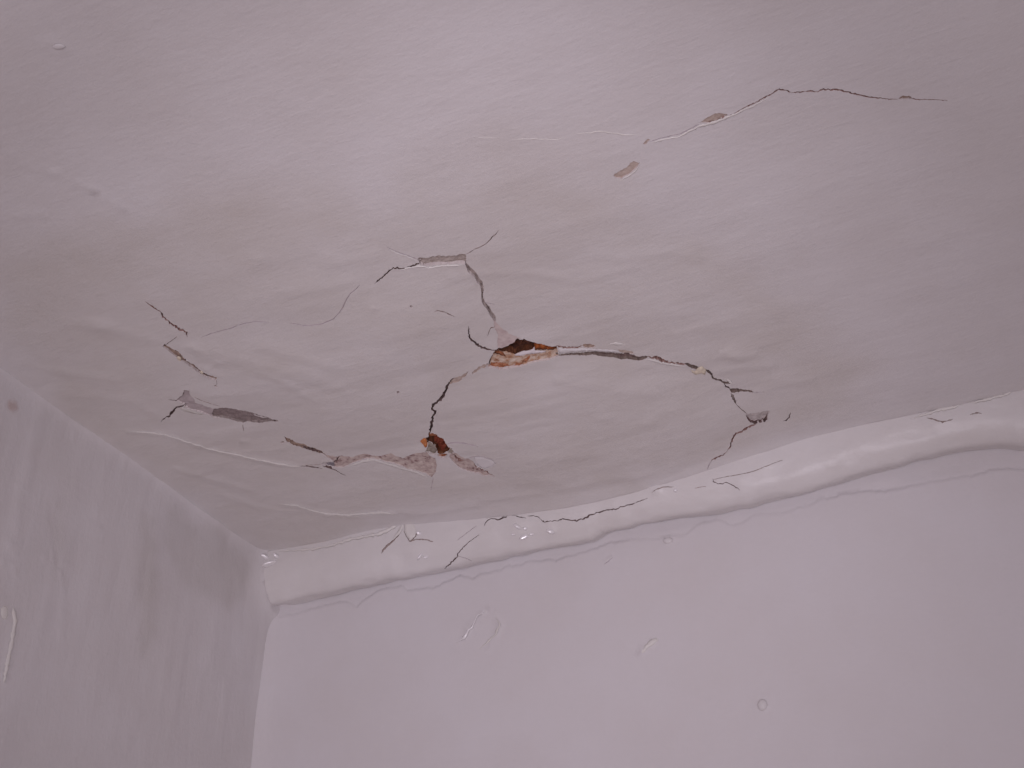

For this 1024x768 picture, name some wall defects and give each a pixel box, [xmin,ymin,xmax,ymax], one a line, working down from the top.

crack [473,88,948,145]
flaking render [614,161,640,181]
crack [146,302,262,387]
crack [292,231,498,432]
flaking render [486,321,559,370]
flaking render [161,390,278,431]
crack [556,342,782,488]
crack [280,437,324,454]
peeling [304,432,496,488]
crack [444,486,669,569]